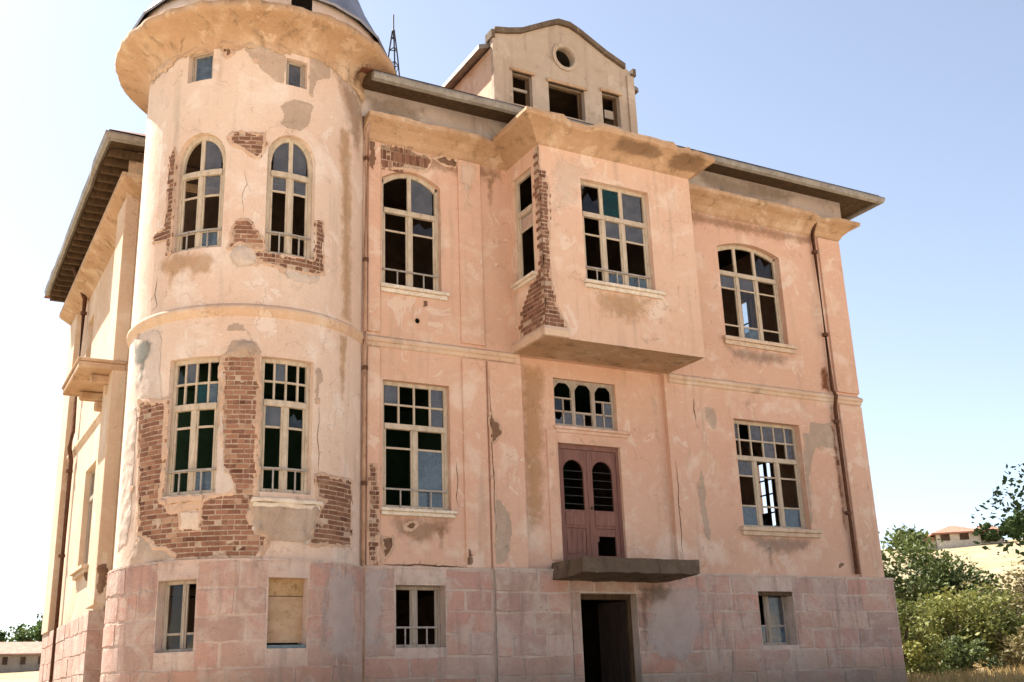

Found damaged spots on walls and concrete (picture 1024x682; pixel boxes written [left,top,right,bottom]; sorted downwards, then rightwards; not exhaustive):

flaking render [226,130,267,159]
flaking render [369,140,458,173]
flaking render [151,146,178,256]
flaking render [226,218,325,284]
flaking render [519,144,570,339]
spalling [315,368,323,404]
flaking render [117,330,272,560]
flaking render [307,472,353,548]
spalling [367,463,419,565]